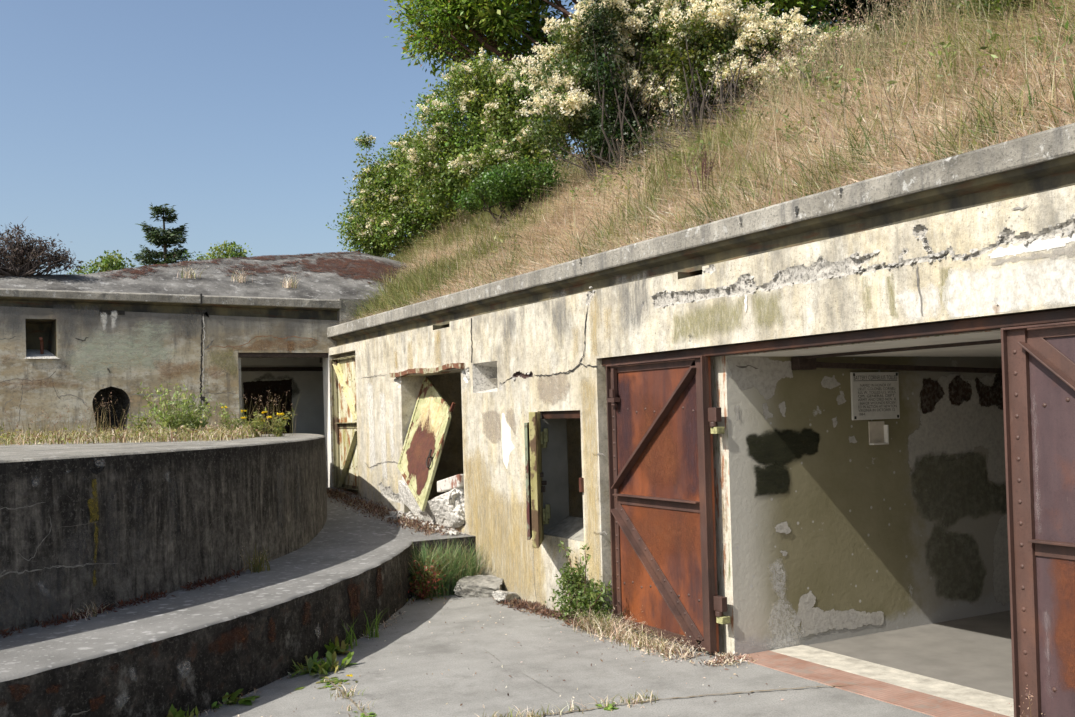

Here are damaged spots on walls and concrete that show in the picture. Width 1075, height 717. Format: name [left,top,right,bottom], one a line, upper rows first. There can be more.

spalling [641,249,881,309]
flaking render [898,213,1075,319]
crack [503,307,598,383]
rust [406,416,435,496]
peeling [907,373,1006,487]
crack [0,502,117,577]
peeling [775,521,791,534]
peeling [770,550,884,649]